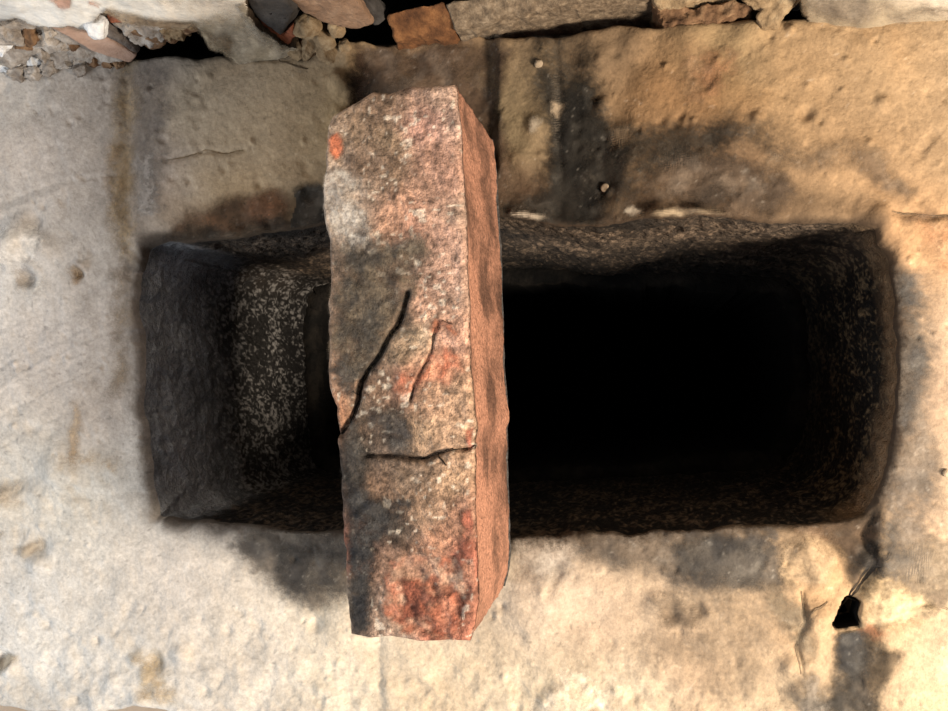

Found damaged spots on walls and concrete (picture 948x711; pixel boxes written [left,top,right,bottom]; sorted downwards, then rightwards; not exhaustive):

peeling [51,0,71,9]
spalling [76,2,294,65]
spalling [742,0,807,31]
crack [341,294,410,434]
crack [411,320,449,400]
crack [378,445,476,465]
crack [795,547,895,674]